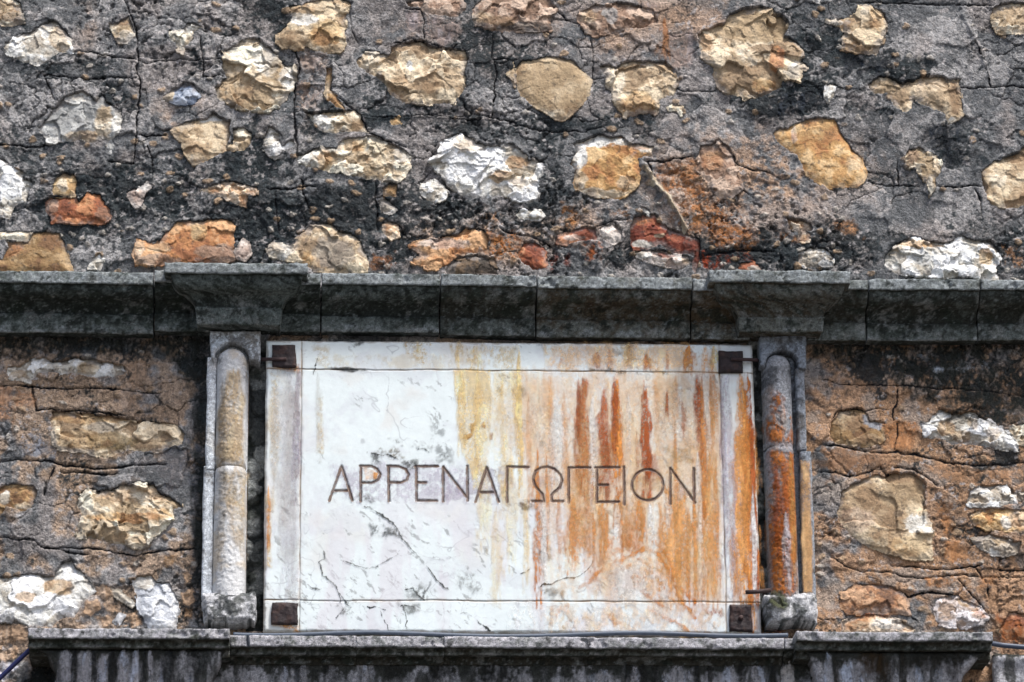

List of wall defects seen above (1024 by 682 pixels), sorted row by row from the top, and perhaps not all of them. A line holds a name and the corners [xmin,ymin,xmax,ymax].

crack [44,0,221,170]
spalling [117,359,146,411]
crack [4,459,167,497]
corrosion [565,346,813,634]
spalling [822,421,916,469]
crack [820,379,1024,485]
spalling [929,465,1023,482]
corrosion [533,450,549,608]
peeling [83,584,141,628]
peeling [181,572,195,617]
crack [310,506,448,628]
crack [836,559,1024,622]